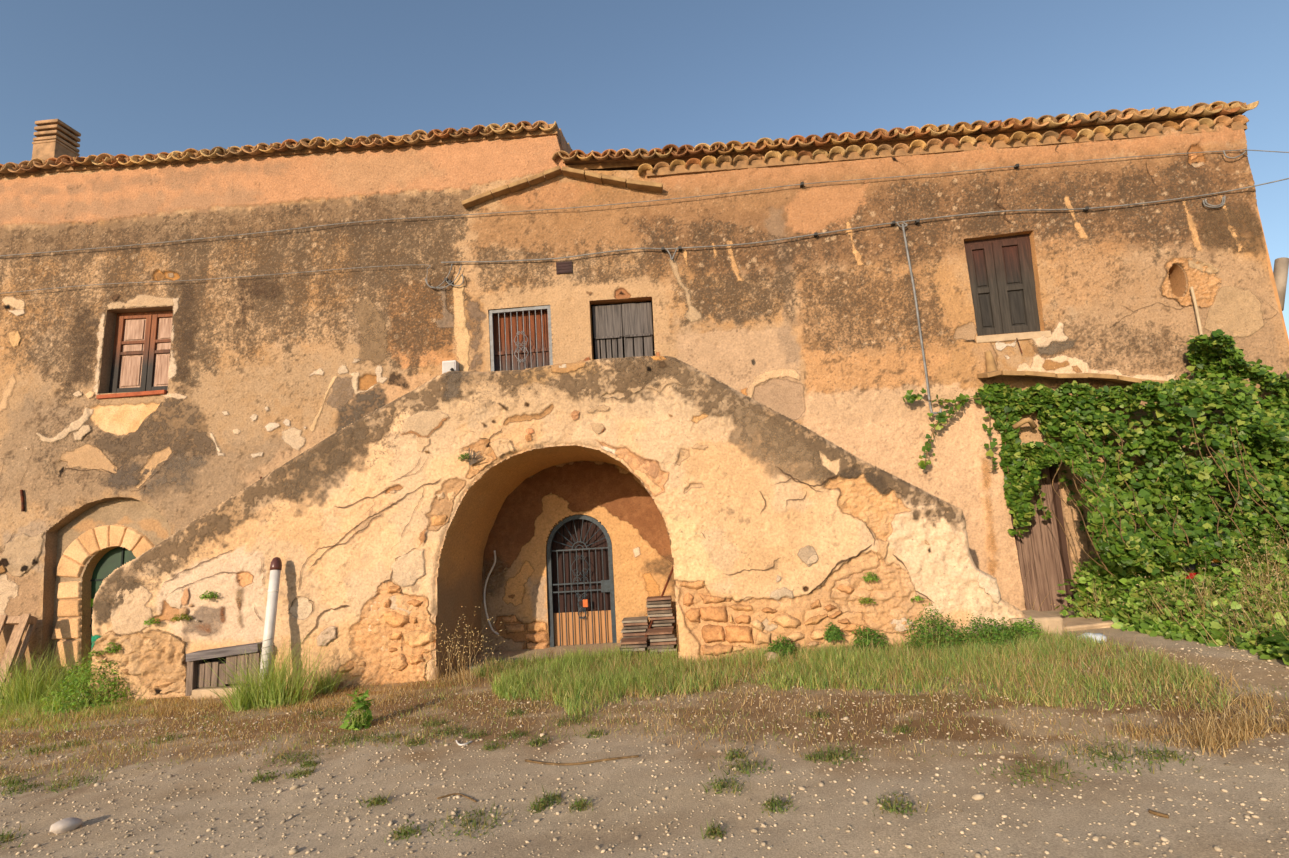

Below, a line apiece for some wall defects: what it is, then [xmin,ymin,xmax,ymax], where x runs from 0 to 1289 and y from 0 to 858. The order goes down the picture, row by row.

water stain [712,241,742,281]
water stain [846,222,863,265]
water stain [1064,196,1088,239]
flaking render [1161,258,1222,308]
water stain [1183,195,1263,252]
flaking render [36,269,186,477]
flaking render [222,359,387,434]
flaking render [953,322,1176,381]
flaking render [355,485,403,533]
flaking render [675,451,932,660]
flaking render [91,585,193,695]
flaking render [316,582,436,687]